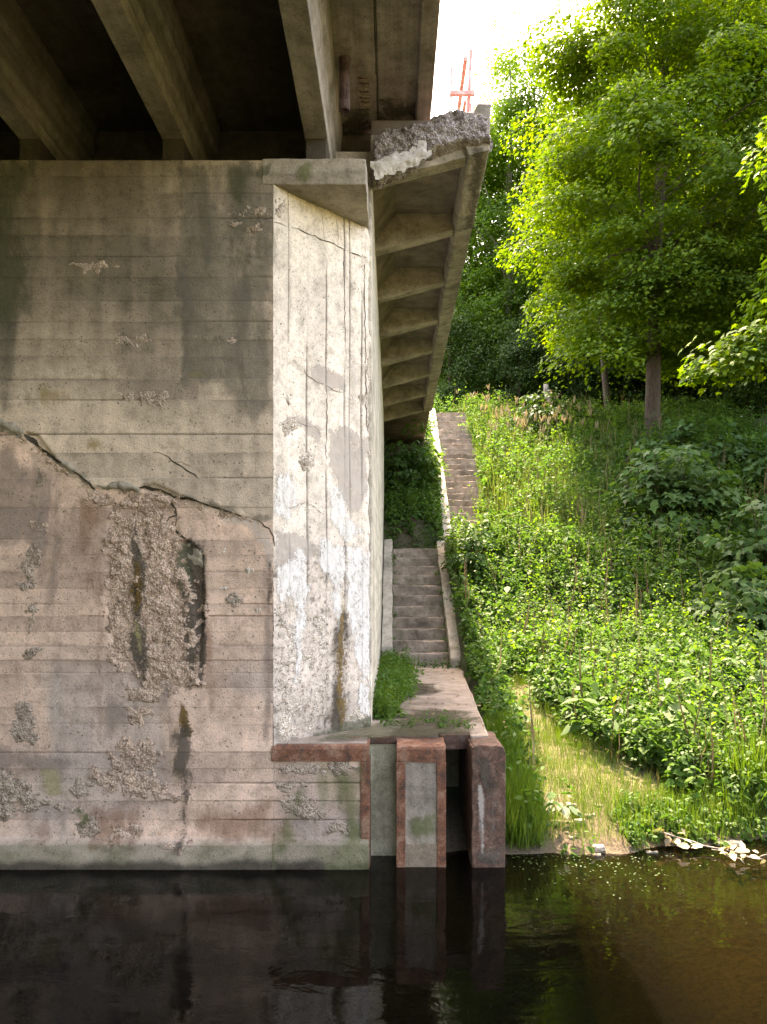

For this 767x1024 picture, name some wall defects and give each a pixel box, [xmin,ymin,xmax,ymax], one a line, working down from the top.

spalling [69,260,120,274]
crack [275,215,368,431]
water stain [311,364,345,391]
spalling [16,466,49,591]
crack [0,417,275,556]
water stain [269,532,336,567]
water stain [294,416,368,512]
spalling [0,490,210,849]
spalling [272,761,361,836]